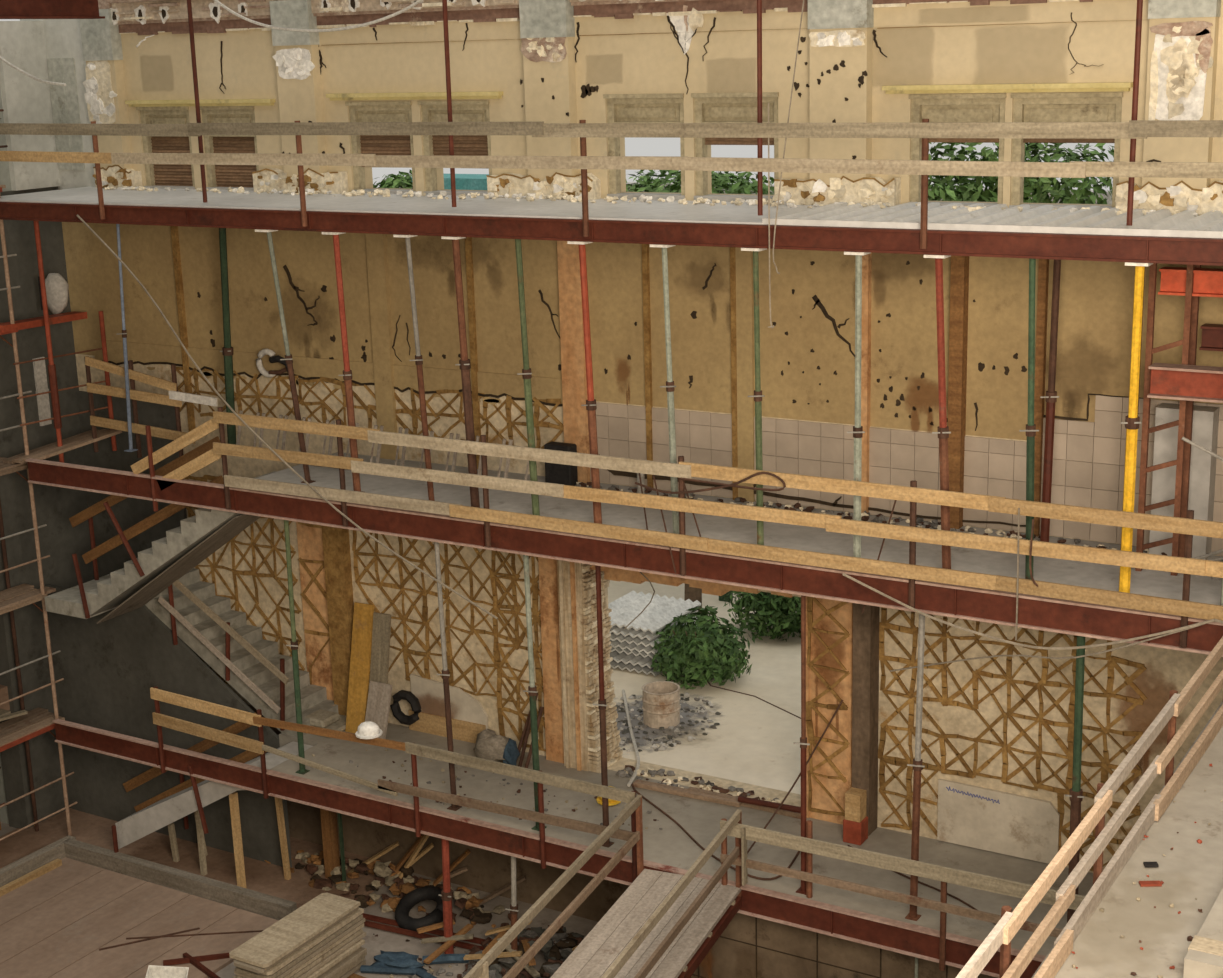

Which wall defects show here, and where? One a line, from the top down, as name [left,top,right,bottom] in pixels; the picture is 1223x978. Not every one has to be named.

peeling [83,60,118,124]
peeling [272,48,315,80]
flaking render [521,37,567,63]
crack [574,17,808,94]
peeling [1148,21,1214,120]
flaking render [486,172,601,200]
flaking render [1115,181,1223,214]
crack [283,265,320,326]
crack [538,290,560,338]
crack [812,295,855,357]